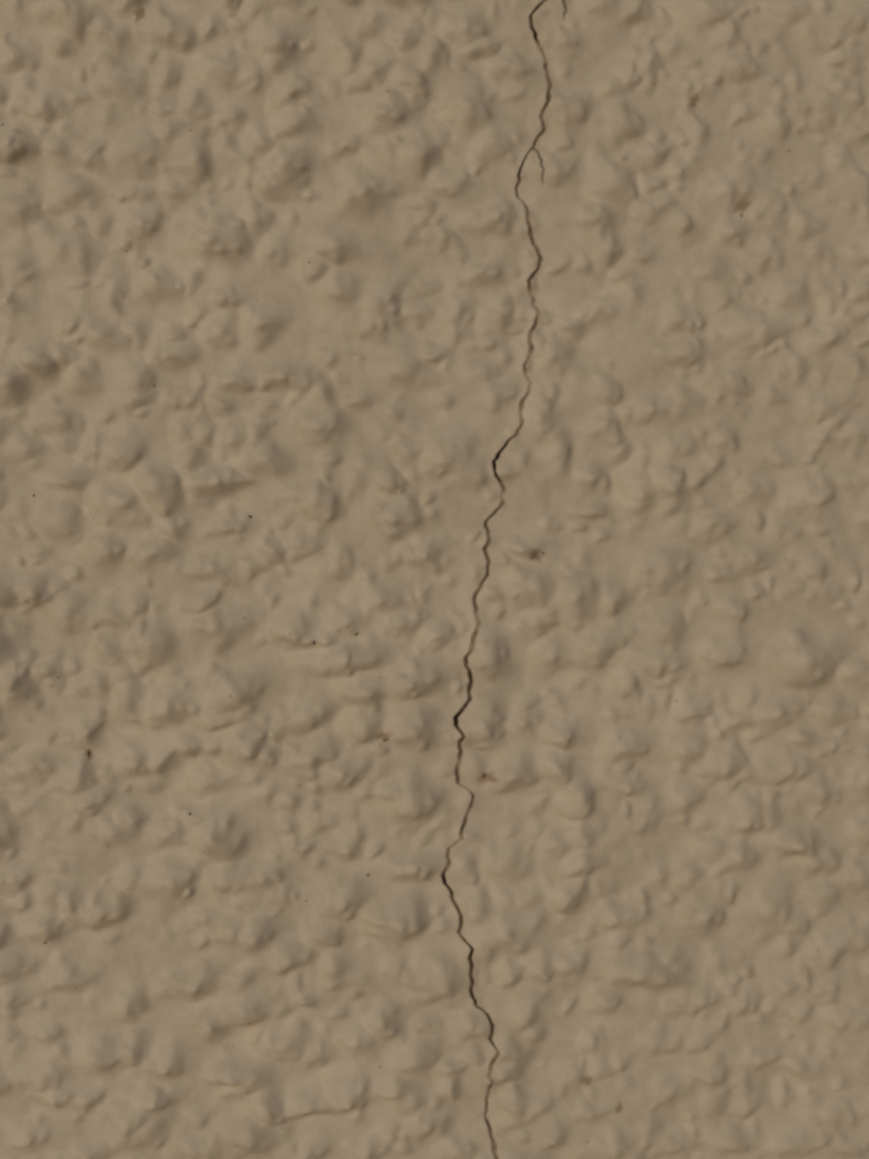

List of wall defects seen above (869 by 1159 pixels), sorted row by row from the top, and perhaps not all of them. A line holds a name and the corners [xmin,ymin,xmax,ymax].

crack [441,0,553,1159]